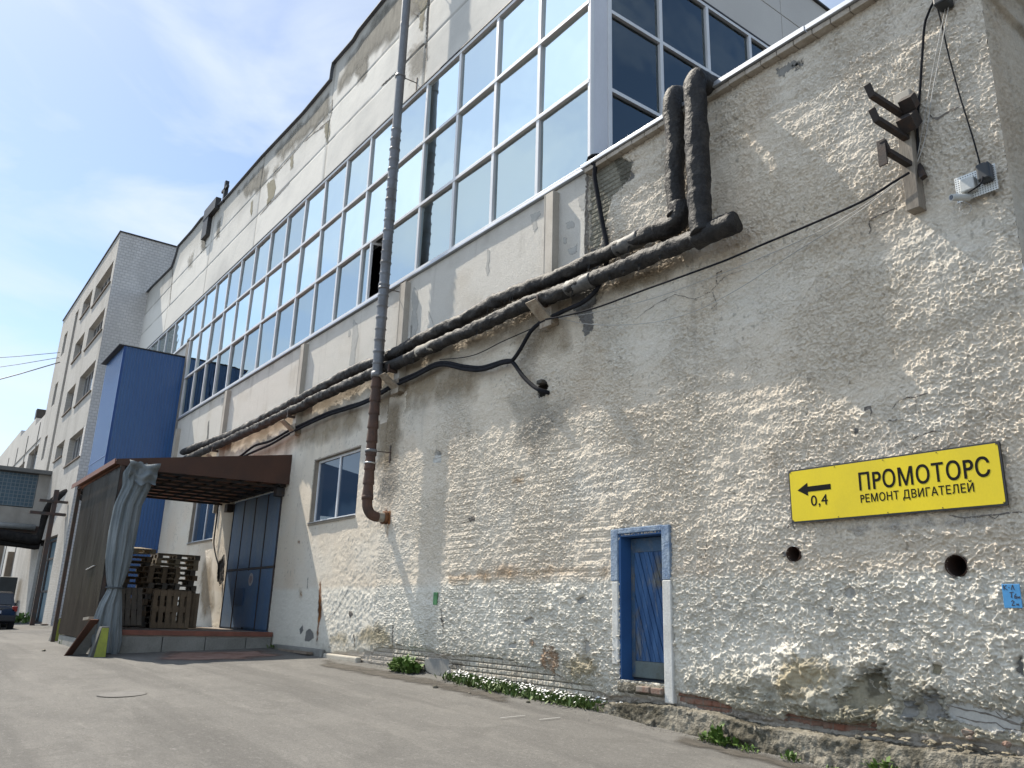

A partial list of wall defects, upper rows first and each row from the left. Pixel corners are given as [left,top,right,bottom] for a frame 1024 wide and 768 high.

damp [276,0,428,169]
peeling [776,60,803,77]
damp [244,168,276,196]
spalling [563,156,635,255]
spalling [450,641,607,703]
peeling [785,668,1024,748]